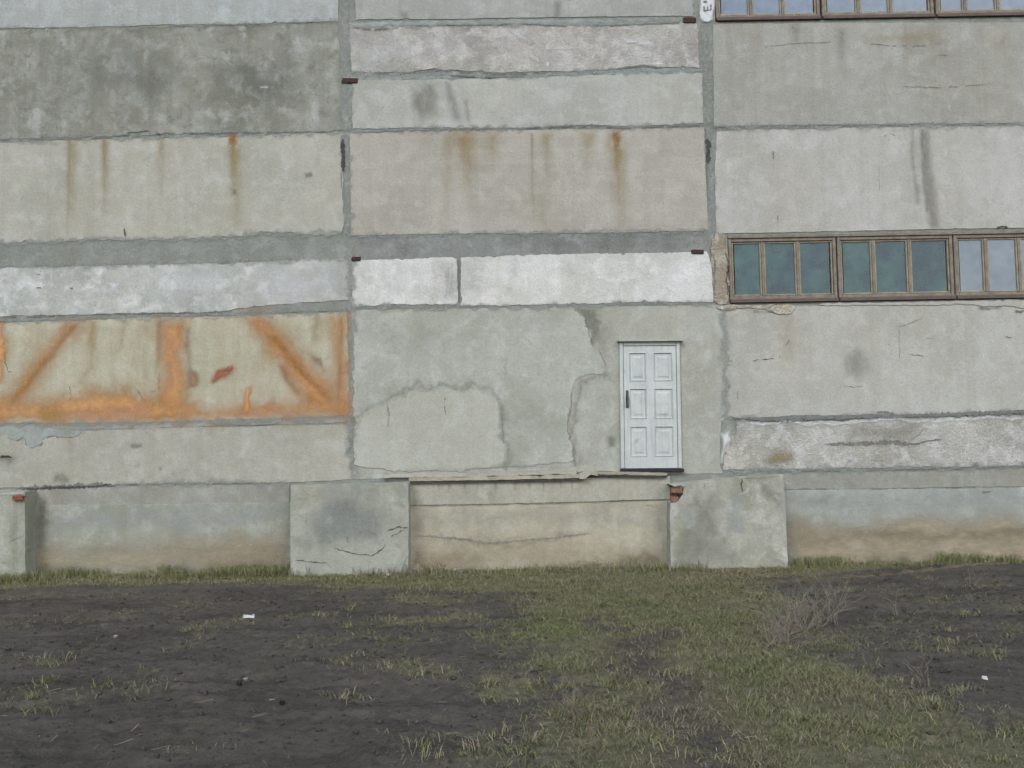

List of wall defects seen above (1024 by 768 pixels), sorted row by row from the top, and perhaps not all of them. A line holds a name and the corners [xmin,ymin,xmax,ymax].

spalling [711,233,796,315]
rust [0,324,208,422]
rust [233,321,347,416]
crack [827,427,941,446]
crack [295,526,588,567]